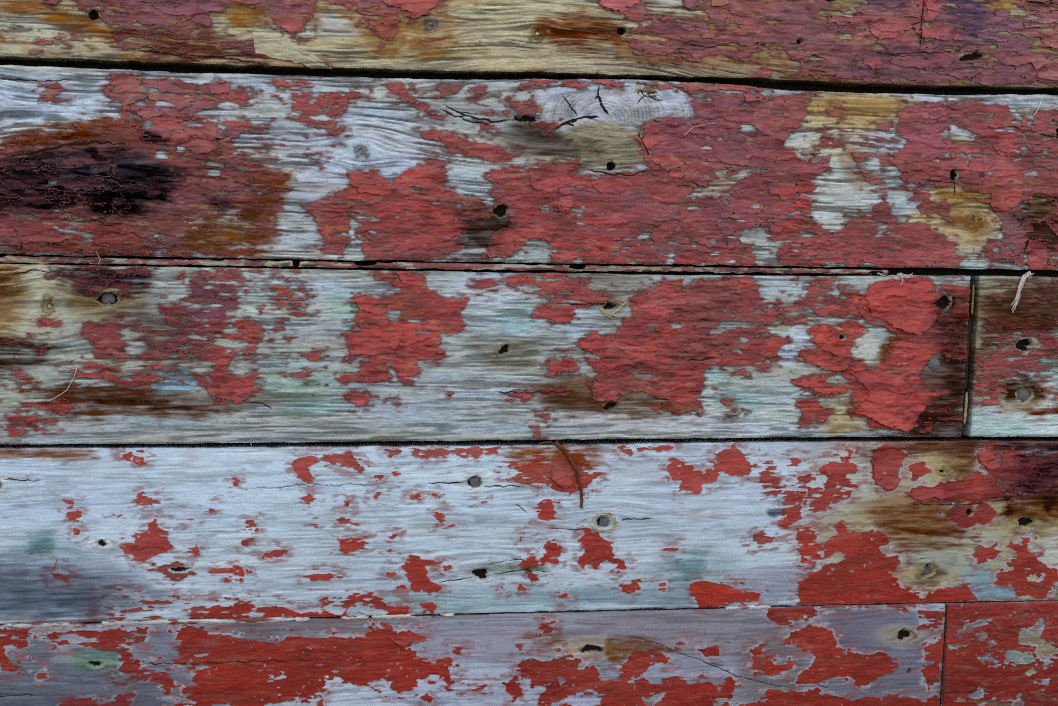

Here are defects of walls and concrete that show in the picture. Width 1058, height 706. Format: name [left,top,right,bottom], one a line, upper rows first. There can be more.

rust [537,13,621,49]
crack [440,104,510,125]
crack [554,87,609,130]
leakage [140,131,168,142]
leakage [0,134,181,214]
peeling [0,0,448,405]
peeling [292,0,1058,706]
peeling [5,409,58,436]
rust [992,491,1058,518]
peeling [119,515,173,563]
rust [879,510,965,551]
peeling [0,564,470,706]